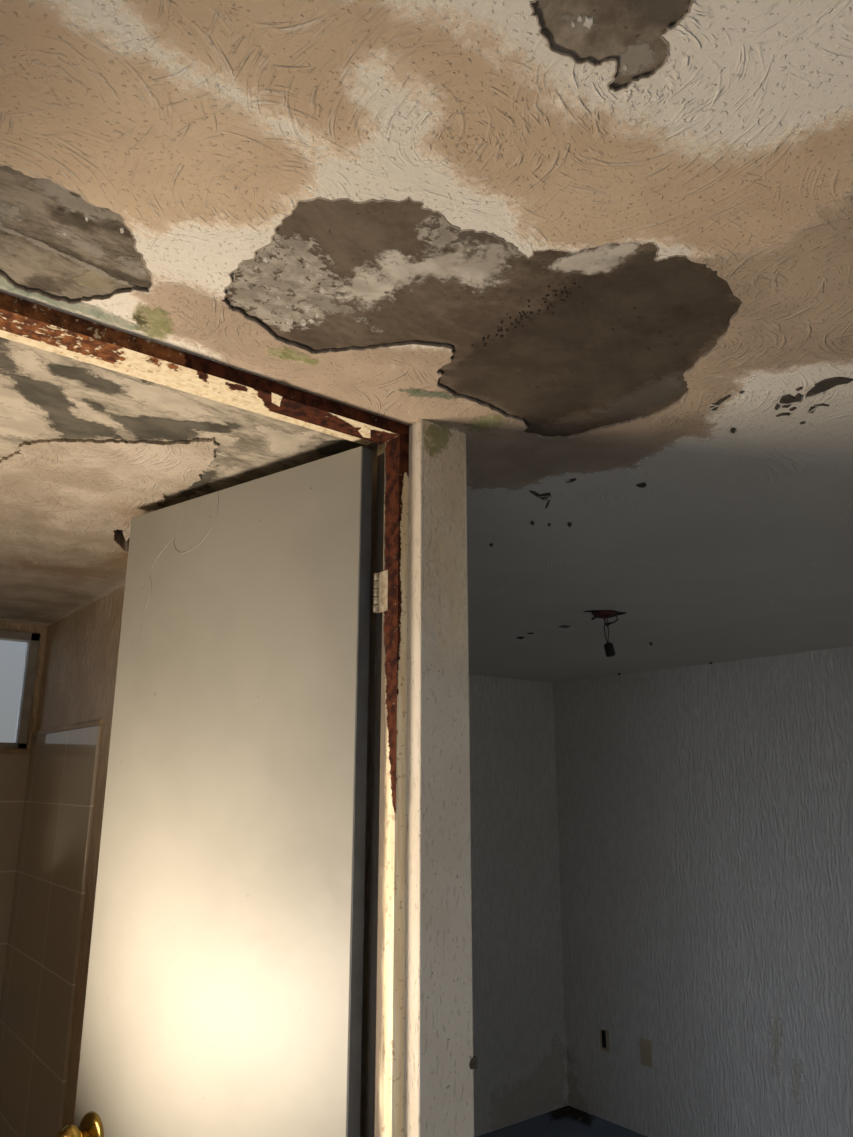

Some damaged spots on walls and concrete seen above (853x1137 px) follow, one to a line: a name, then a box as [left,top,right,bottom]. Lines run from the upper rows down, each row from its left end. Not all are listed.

spalling [529,0,693,92]
spalling [0,165,153,303]
spalling [0,337,378,512]
water stain [0,0,853,490]
spalling [222,197,744,439]
peeling [775,377,853,425]
water stain [0,442,218,623]
corrosion [0,292,409,813]